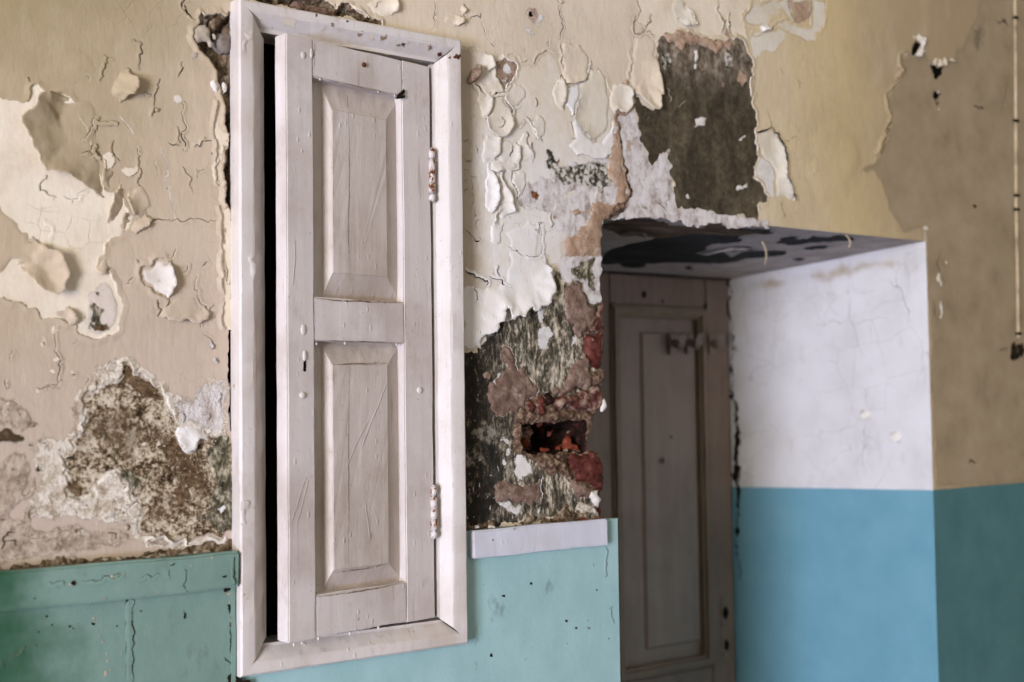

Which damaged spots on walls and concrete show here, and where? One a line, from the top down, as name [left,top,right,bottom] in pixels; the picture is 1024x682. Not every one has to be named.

peeling [0,7,231,346]
crack [79,38,230,363]
peeling [461,0,854,353]
peeling [863,0,1024,487]
leakage [55,356,232,549]
crack [179,392,222,436]
spalling [512,392,594,480]